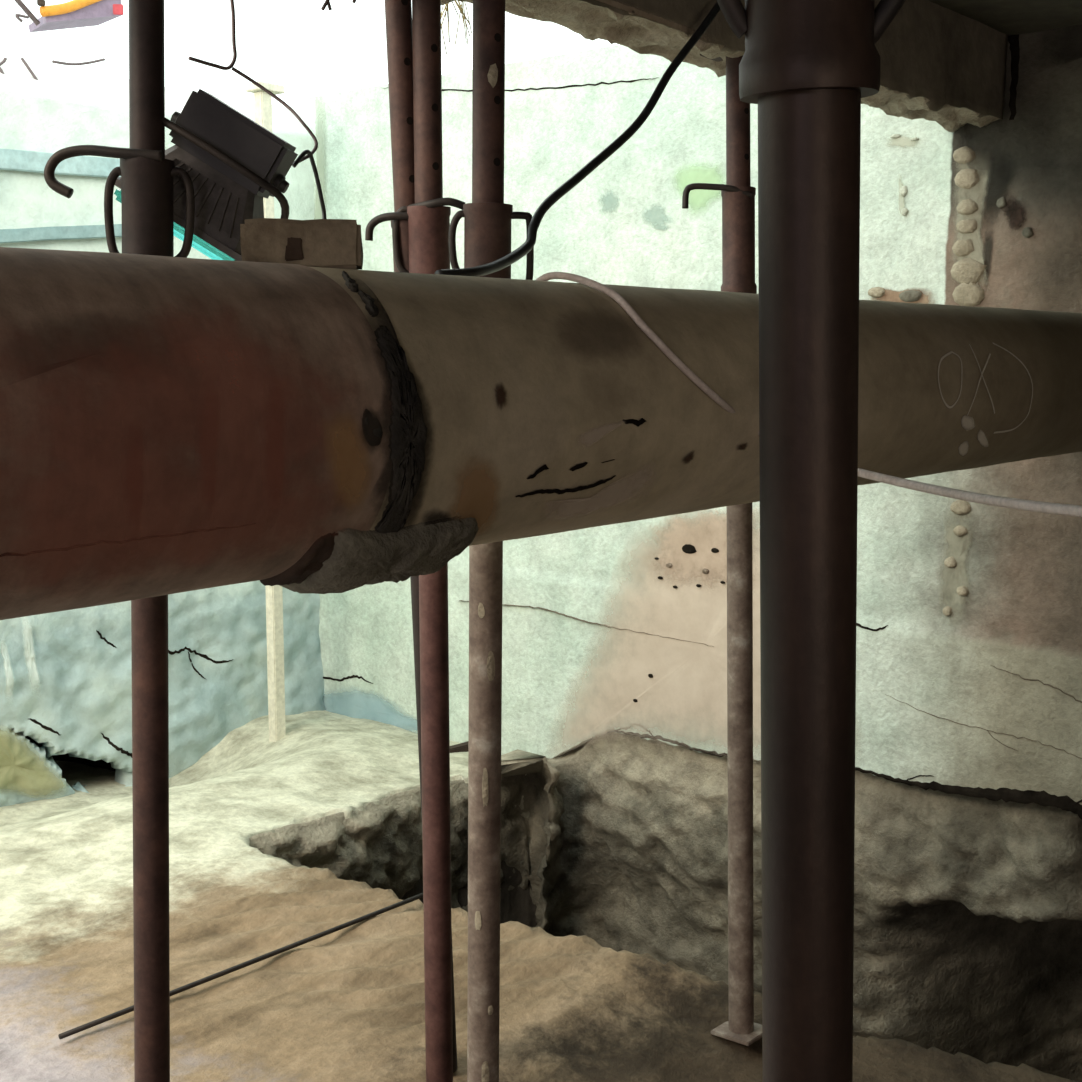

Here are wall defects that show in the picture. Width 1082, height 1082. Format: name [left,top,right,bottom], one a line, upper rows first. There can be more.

crack [622,418,646,427]
crack [516,459,616,498]
crack [504,604,714,647]
crack [96,630,116,648]
crack [168,646,234,679]
crack [991,665,1082,703]
crack [30,718,60,735]
crack [101,733,132,758]
spalling [52,753,116,771]